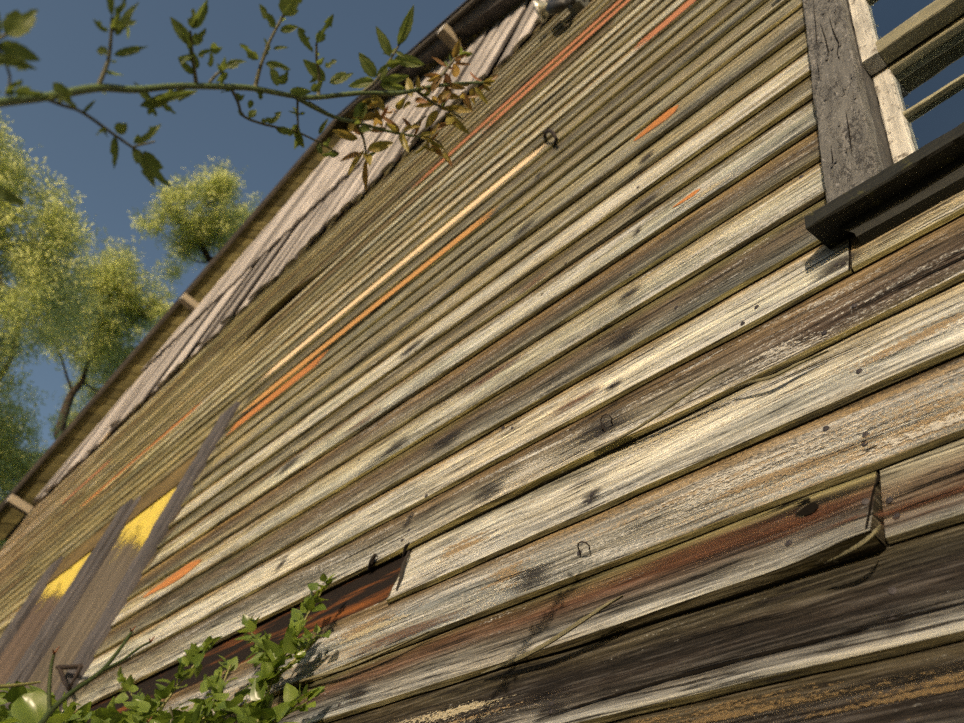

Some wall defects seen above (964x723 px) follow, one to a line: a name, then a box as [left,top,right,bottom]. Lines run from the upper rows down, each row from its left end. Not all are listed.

crack [789,410,942,471]
crack [865,466,964,527]